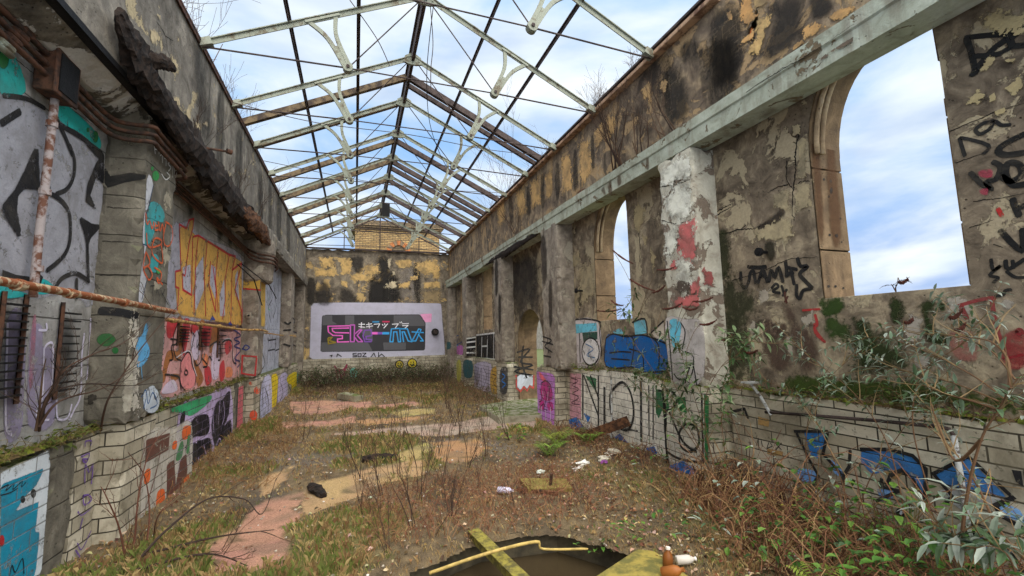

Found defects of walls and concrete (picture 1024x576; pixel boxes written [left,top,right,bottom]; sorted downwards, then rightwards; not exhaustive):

peeling [641,80,668,105]
damp [646,59,688,122]
damp [681,8,742,100]
peeling [726,0,772,55]
damp [765,0,832,57]
peeling [793,6,855,50]
peeling [965,74,1023,116]
peeling [980,55,1015,72]
peeling [975,8,1024,37]
crack [767,134,810,219]
peeling [631,154,715,307]
spalling [313,255,442,303]